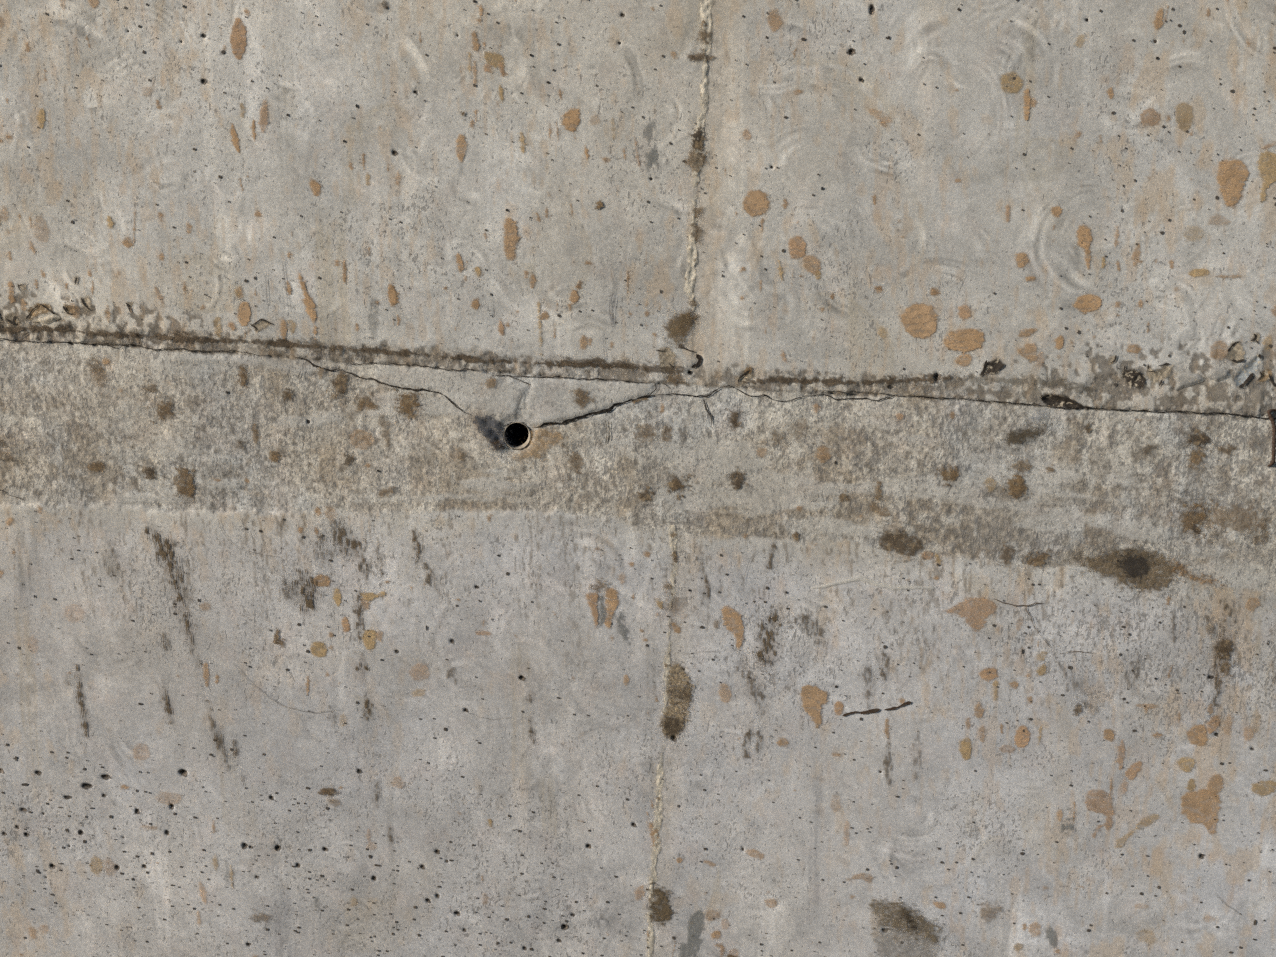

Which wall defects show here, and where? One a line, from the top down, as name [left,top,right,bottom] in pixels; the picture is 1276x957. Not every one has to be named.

crack [0,329,1276,442]
water stain [1081,546,1217,592]
water stain [1178,600,1235,833]
water stain [1104,729,1142,780]
water stain [868,899,945,942]